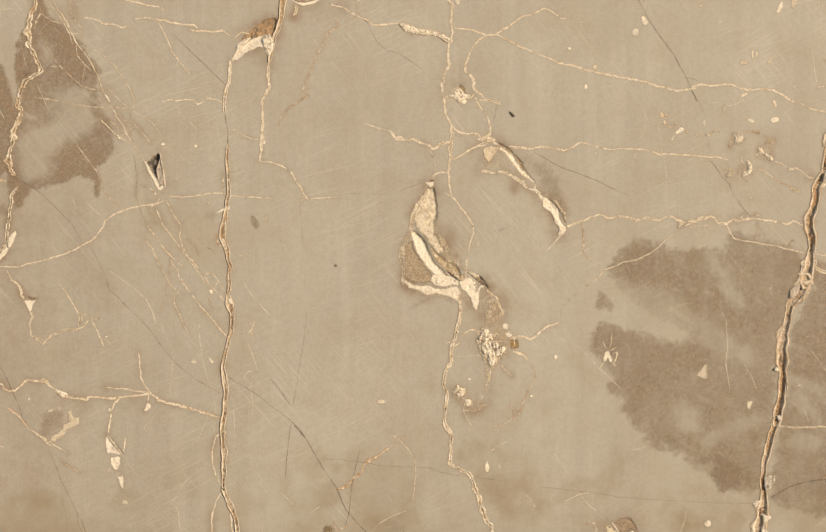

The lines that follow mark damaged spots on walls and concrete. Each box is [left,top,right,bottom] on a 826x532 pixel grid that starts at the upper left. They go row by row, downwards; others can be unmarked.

spalling [231,0,319,63]
water stain [0,0,112,207]
spalling [106,435,126,489]
crack [0,0,273,532]
spalling [144,154,166,190]
crack [336,433,417,499]
spalling [398,179,499,317]
crack [442,290,494,532]
spalling [461,328,512,392]
crack [163,0,826,274]
spalling [474,137,566,250]
crack [511,132,826,532]